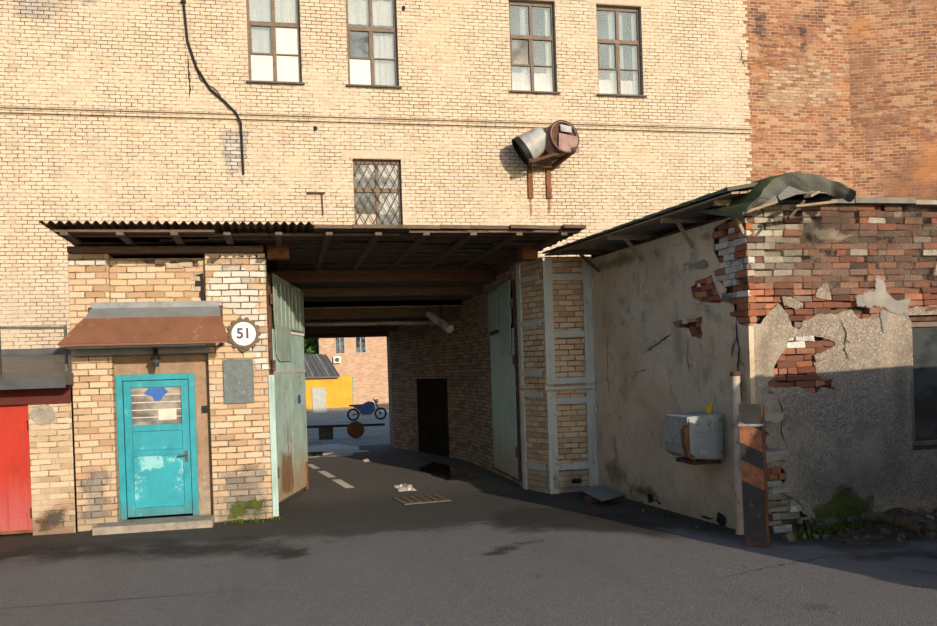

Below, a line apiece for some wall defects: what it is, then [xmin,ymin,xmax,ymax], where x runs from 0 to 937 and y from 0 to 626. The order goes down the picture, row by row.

spalling [674,317,702,339]
spalling [692,204,937,393]